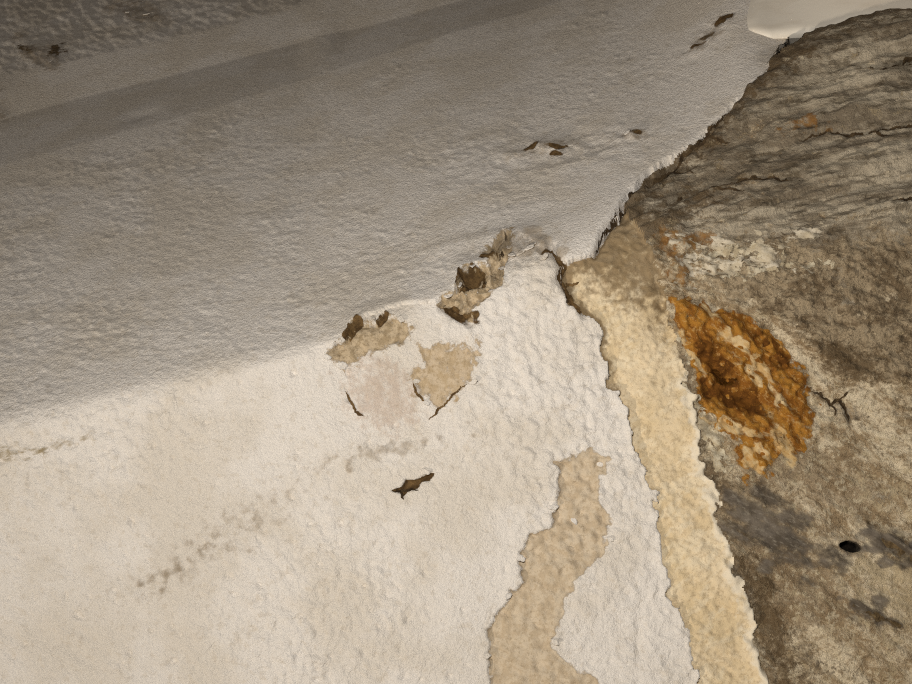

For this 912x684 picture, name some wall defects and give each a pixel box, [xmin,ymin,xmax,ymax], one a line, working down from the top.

spalling [690,13,733,49]
spalling [436,226,537,325]
corrosion [659,229,717,285]
spalling [323,310,414,372]
peeling [411,339,482,419]
corrosion [668,296,821,486]
spalling [392,468,434,500]
peeling [482,447,614,684]